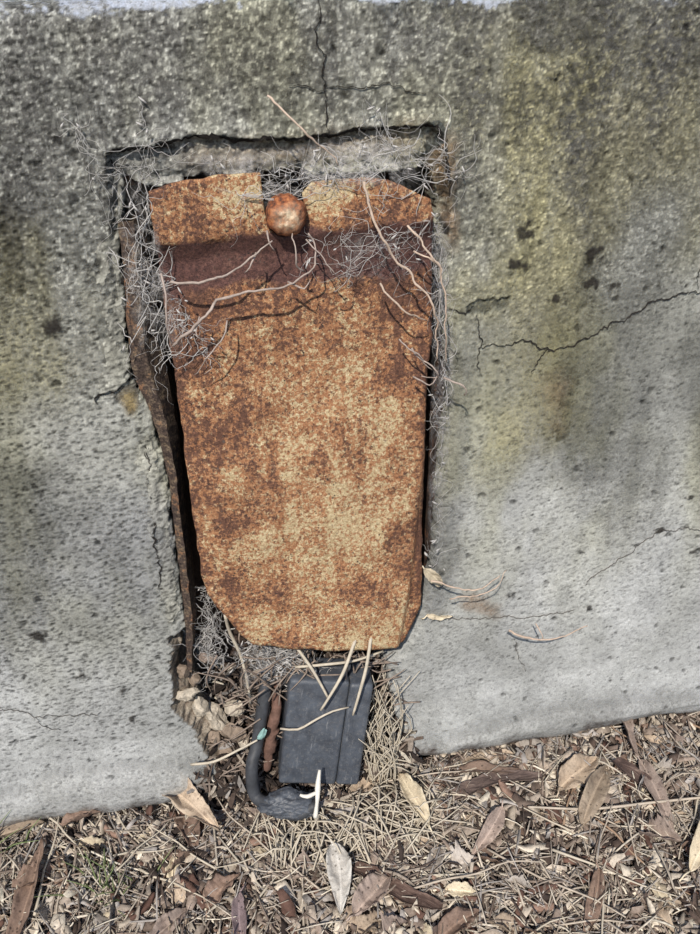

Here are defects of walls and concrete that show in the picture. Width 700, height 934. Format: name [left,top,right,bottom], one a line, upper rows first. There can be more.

crack [103,0,452,194]
crack [448,270,700,376]
crack [586,527,700,585]